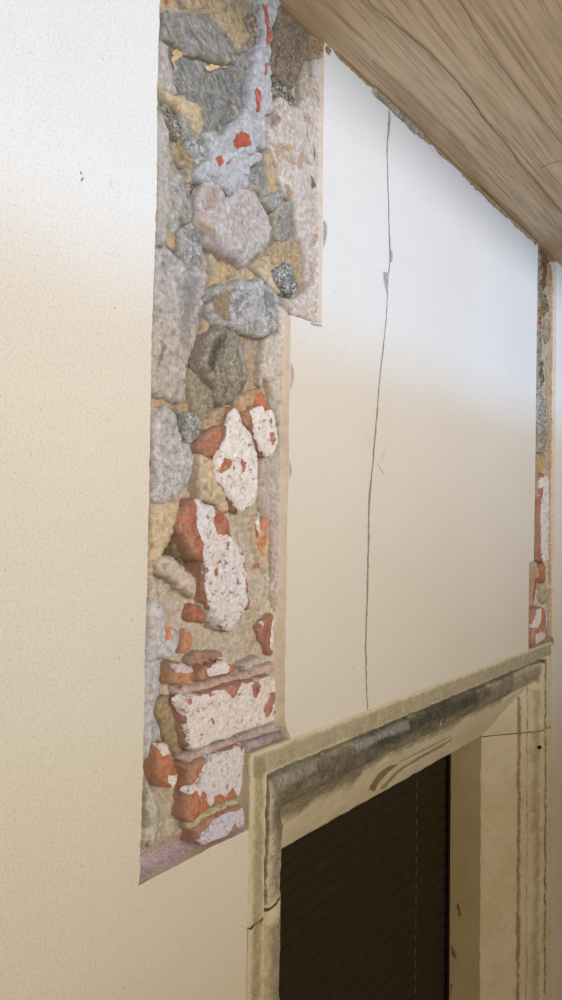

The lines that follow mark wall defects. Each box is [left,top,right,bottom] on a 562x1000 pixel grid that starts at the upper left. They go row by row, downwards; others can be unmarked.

flaking render [138,0,332,885]
crack [365,109,393,710]
flaking render [528,249,554,648]
crack [250,895,281,930]